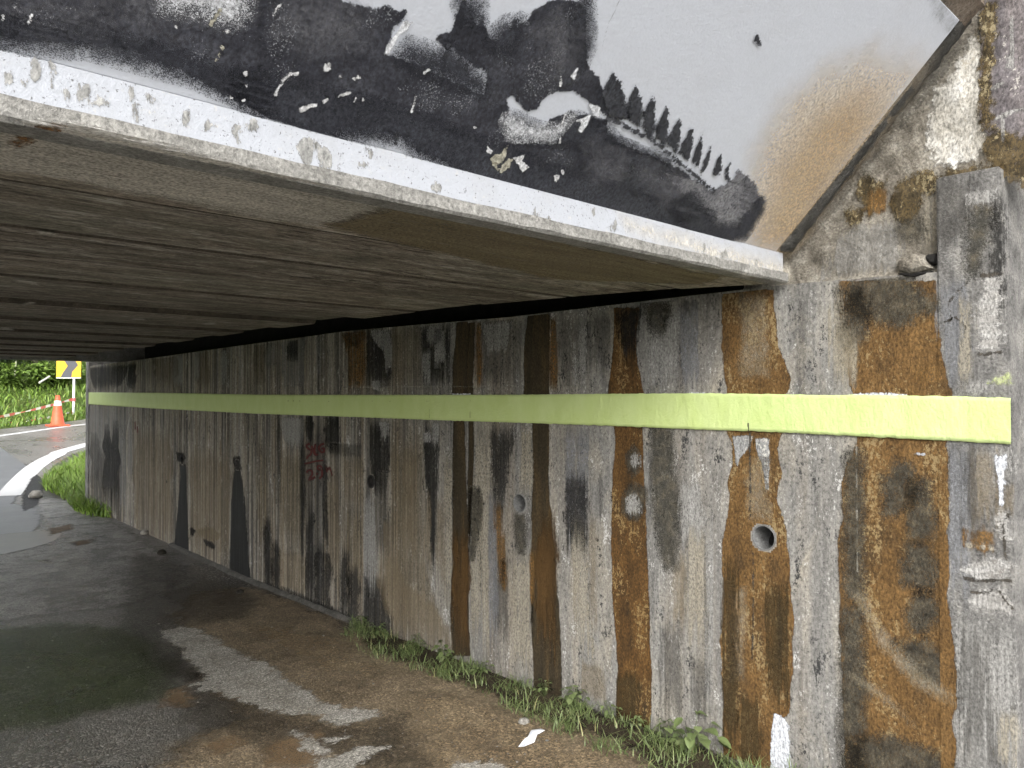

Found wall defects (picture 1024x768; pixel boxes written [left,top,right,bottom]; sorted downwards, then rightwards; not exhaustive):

peeling [296,137,340,169]
peeling [299,62,364,113]
water stain [0,120,721,284]
peeling [486,146,529,173]
water stain [523,314,550,395]
rust [833,276,953,396]
water stain [423,421,594,696]
rust [611,426,652,729]
water stain [648,428,713,694]
rust [719,430,794,768]
rust [833,436,964,768]
spalling [960,505,1017,617]